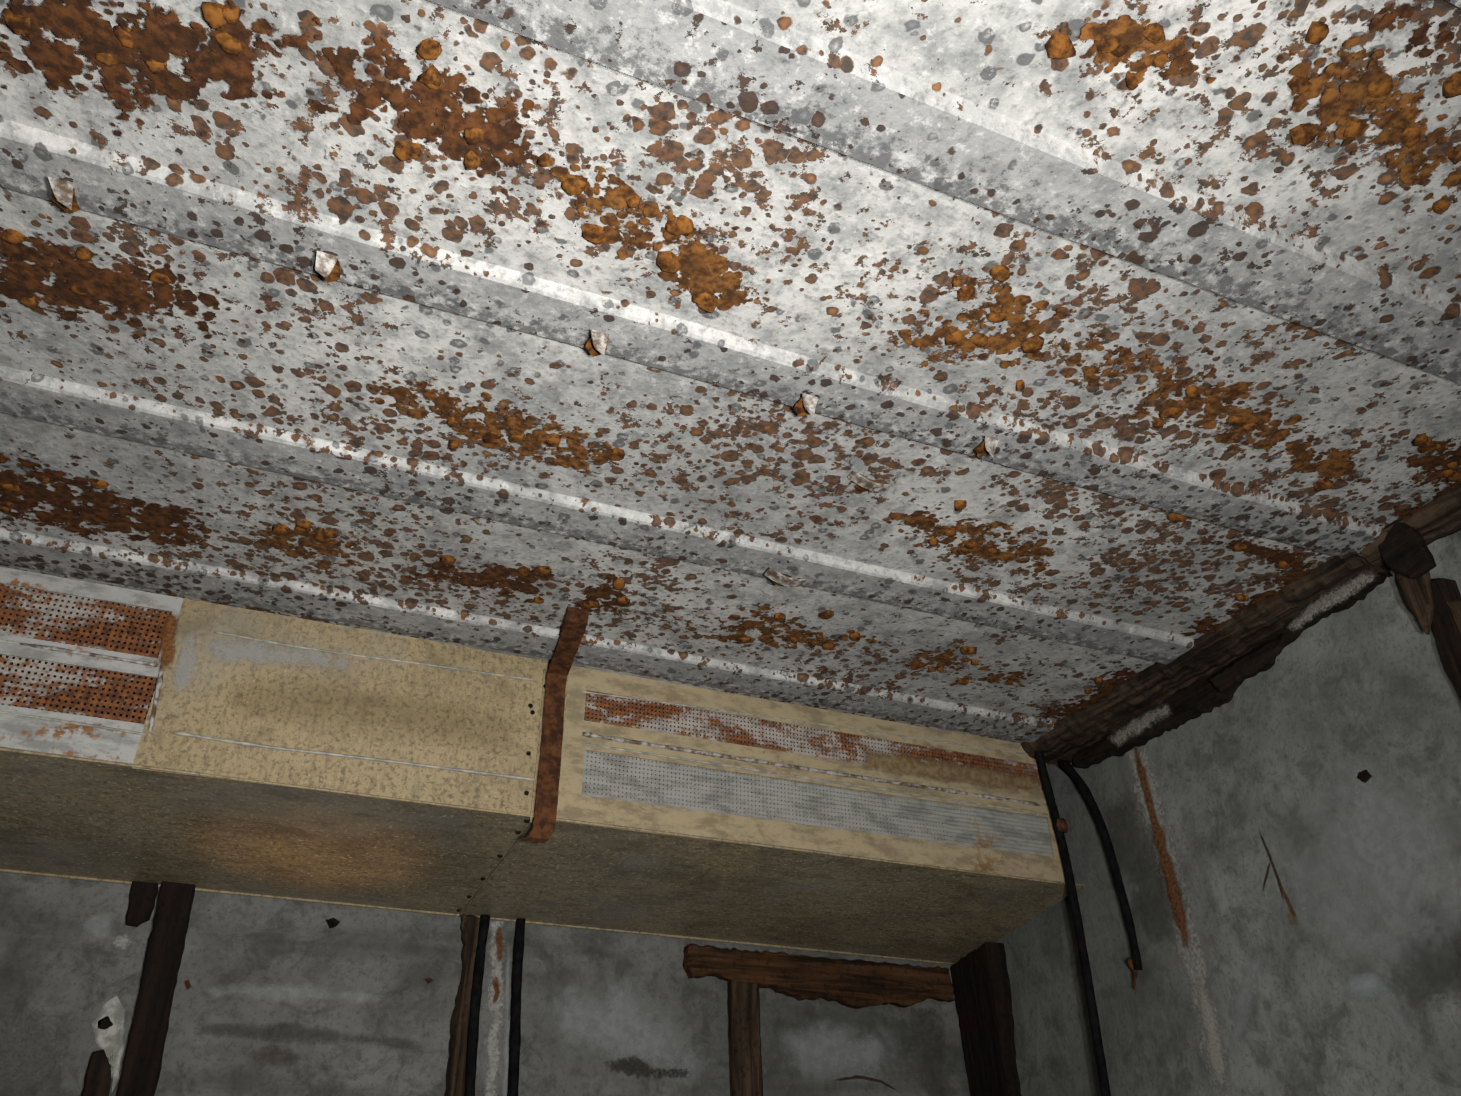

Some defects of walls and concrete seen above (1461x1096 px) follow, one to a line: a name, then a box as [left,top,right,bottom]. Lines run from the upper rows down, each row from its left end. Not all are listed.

rust [0,0,771,313]
rust [1033,13,1226,91]
rust [1277,3,1461,215]
rust [0,221,239,355]
rust [369,371,648,476]
rust [887,265,1461,521]
rust [160,615,178,669]
rust [0,450,374,570]
rust [403,555,634,615]
rust [662,596,1141,718]
rust [883,500,1059,580]
rust [1166,512,1328,640]